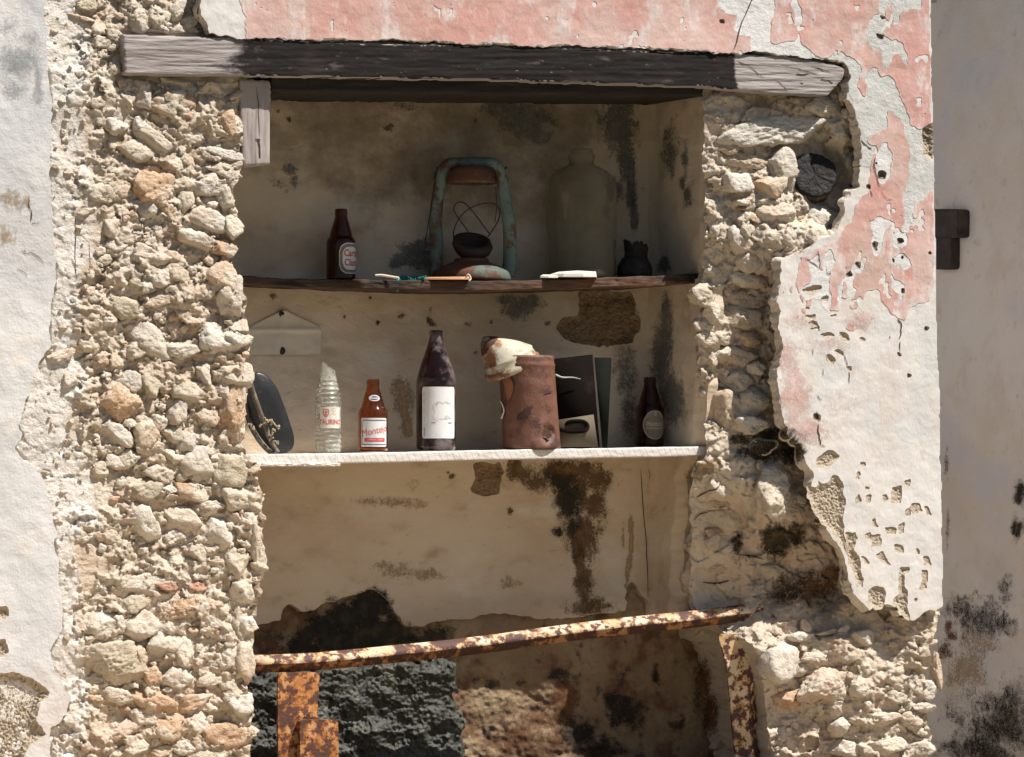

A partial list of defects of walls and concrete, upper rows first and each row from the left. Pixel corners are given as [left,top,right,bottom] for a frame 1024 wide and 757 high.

water stain [661,127,692,205]
peeling [718,0,935,299]
spalling [556,290,641,348]
peeling [788,249,875,371]
water stain [506,460,614,620]
spalling [776,345,931,621]
mould [1010,520,1024,539]
mould [1013,479,1024,505]
spalling [0,672,48,757]
corrosion [502,679,579,757]
corrosion [693,658,718,734]
water stain [943,579,1024,757]